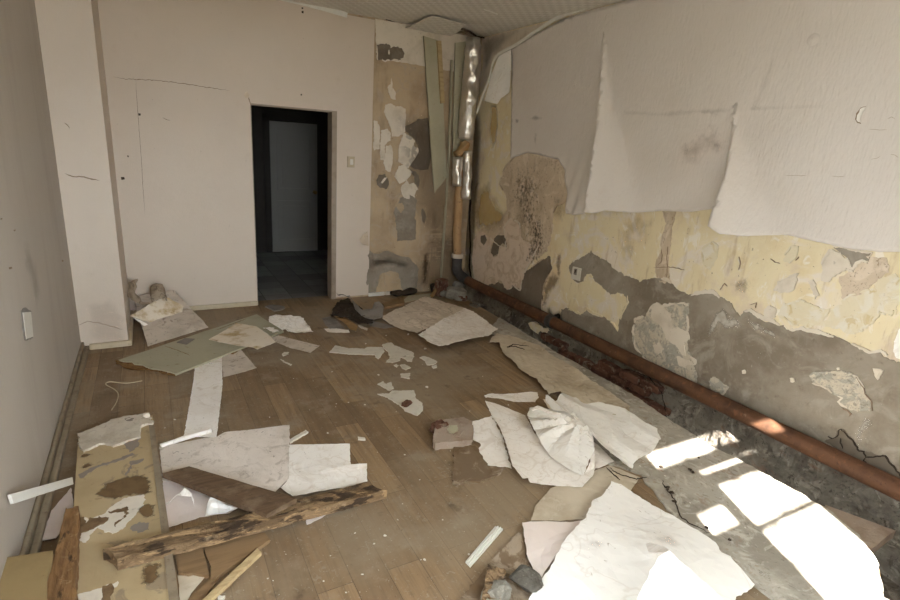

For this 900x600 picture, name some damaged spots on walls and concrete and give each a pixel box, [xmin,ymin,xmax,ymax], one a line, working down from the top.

peeling [375,6,605,84]
crack [113,76,252,210]
peeling [373,78,431,241]
spalling [366,249,419,293]
peeling [472,218,552,311]
spalling [528,322,673,422]
spalling [561,211,900,478]
crack [827,408,900,476]